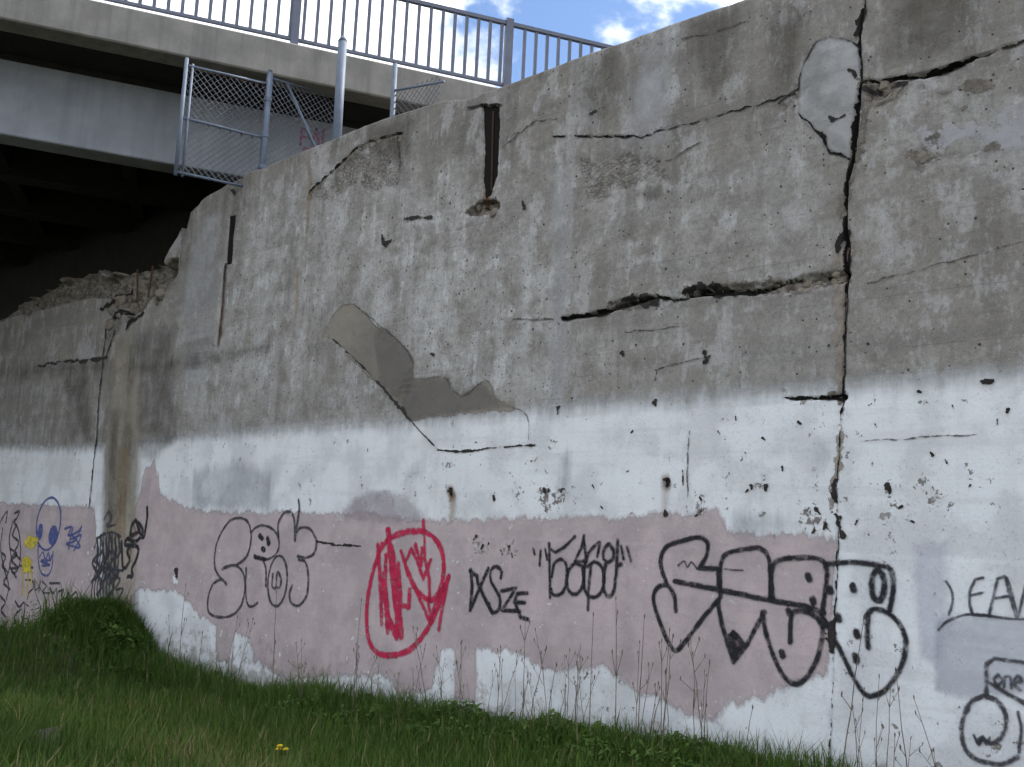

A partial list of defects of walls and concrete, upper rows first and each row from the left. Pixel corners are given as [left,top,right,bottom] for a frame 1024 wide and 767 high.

crack [307,132,404,201]
spalling [0,257,181,332]
crack [219,263,228,337]
crack [38,329,116,505]
water stain [107,349,148,599]
peeling [328,304,514,422]
crack [503,2,1024,764]